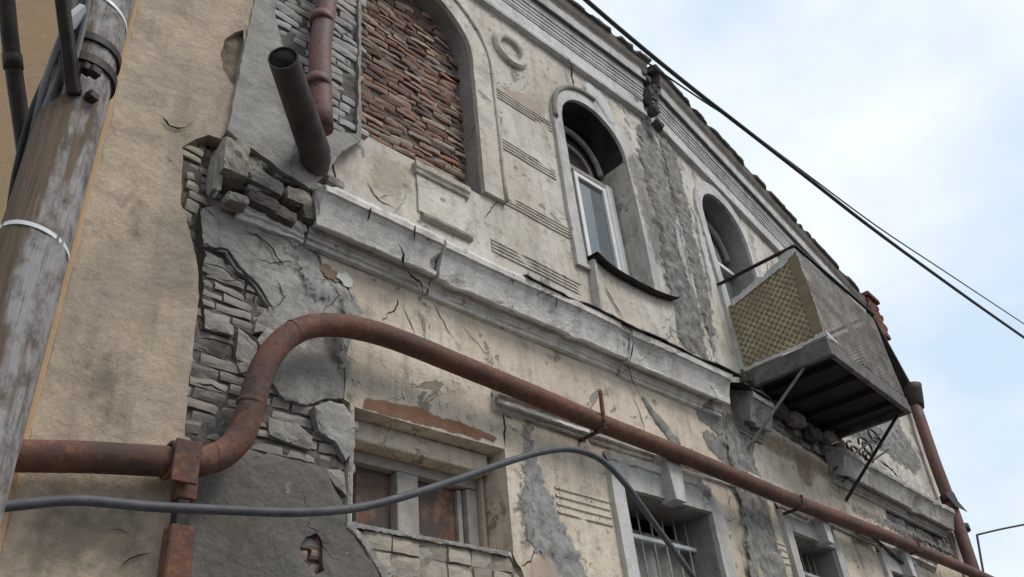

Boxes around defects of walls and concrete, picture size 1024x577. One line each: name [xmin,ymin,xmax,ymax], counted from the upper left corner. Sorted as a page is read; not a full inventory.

spalling [221,34,243,85]
spalling [275,0,315,77]
spalling [331,0,369,141]
crack [197,382,229,395]
crack [195,208,286,362]
spalling [170,144,353,446]
spalling [187,337,558,577]
crack [383,225,484,351]
crack [604,286,645,430]
spalling [739,370,955,559]